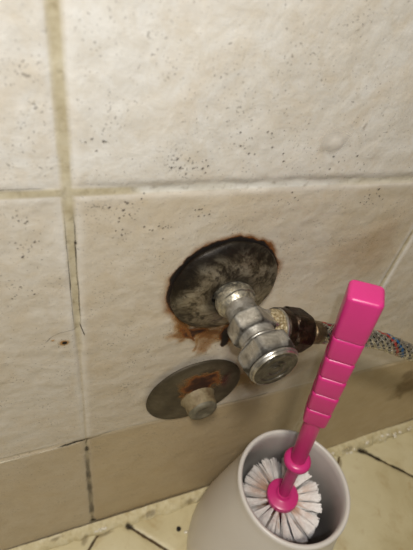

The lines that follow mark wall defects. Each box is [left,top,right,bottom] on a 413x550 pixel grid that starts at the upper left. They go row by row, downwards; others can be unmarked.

crack [65,235,85,335]
rust [166,235,280,351]
rust [179,371,227,398]